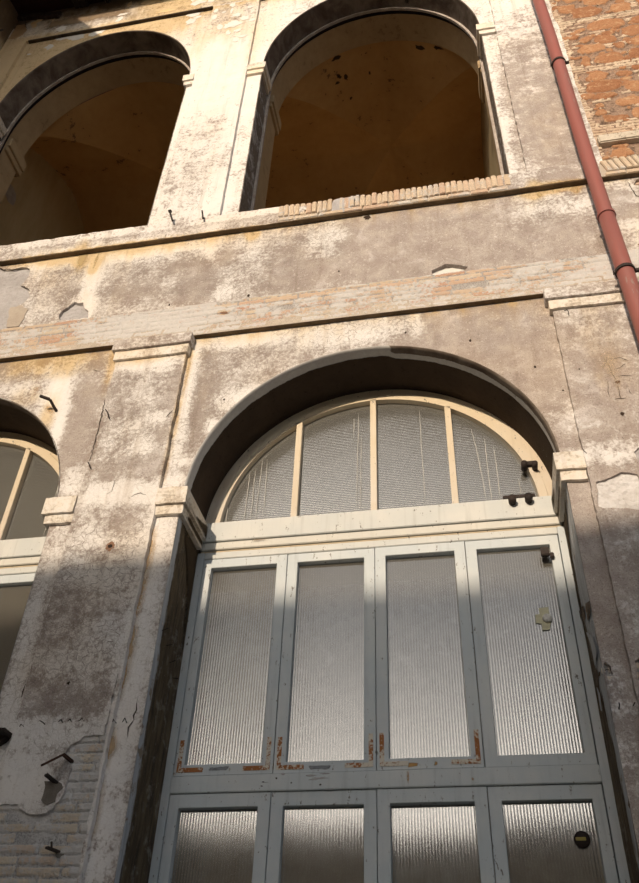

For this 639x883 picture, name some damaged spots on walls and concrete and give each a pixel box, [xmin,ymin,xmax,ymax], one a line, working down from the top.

flaking render [0,269,30,329]
flaking render [596,474,639,510]
flaking render [0,696,115,883]